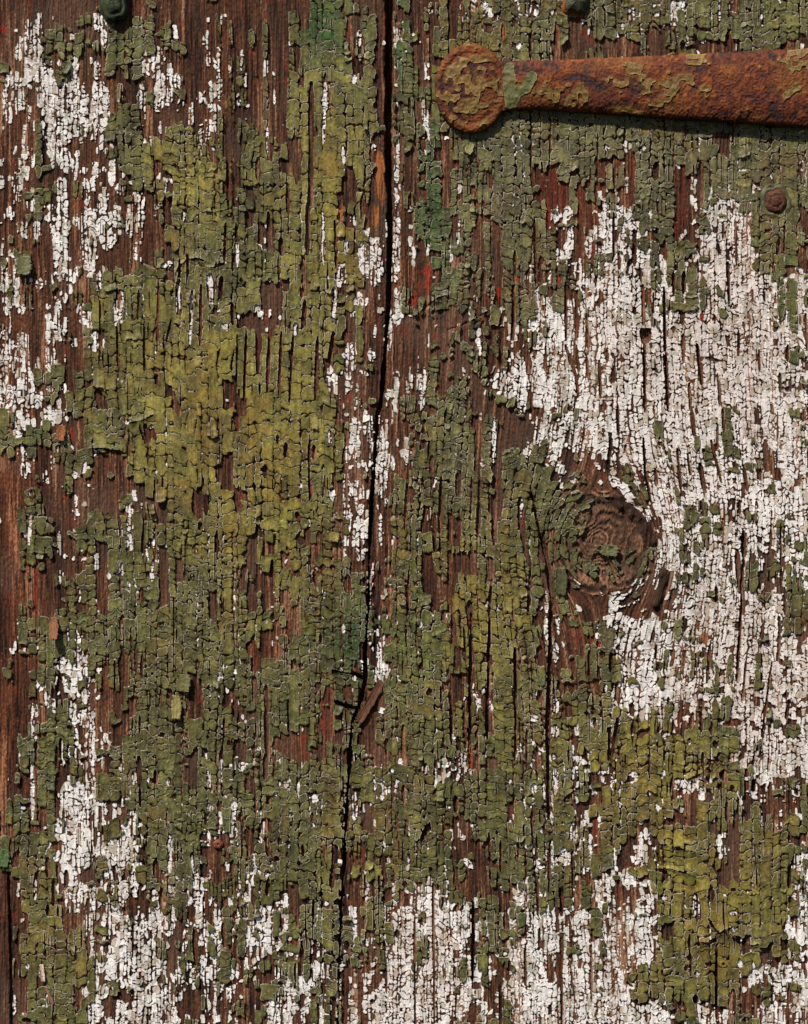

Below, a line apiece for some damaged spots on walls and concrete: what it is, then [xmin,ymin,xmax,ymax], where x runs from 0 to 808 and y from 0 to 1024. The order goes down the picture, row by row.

peeling [264,279,291,329]
peeling [0,16,177,820]
peeling [192,486,210,518]
crack [331,0,449,1024]
peeling [329,20,808,805]
peeling [242,526,343,785]
peeling [0,847,20,1024]
peeling [49,617,335,1024]
peeling [348,819,674,1024]
peeling [682,786,705,827]
peeling [715,848,753,882]
peeling [746,841,808,1024]